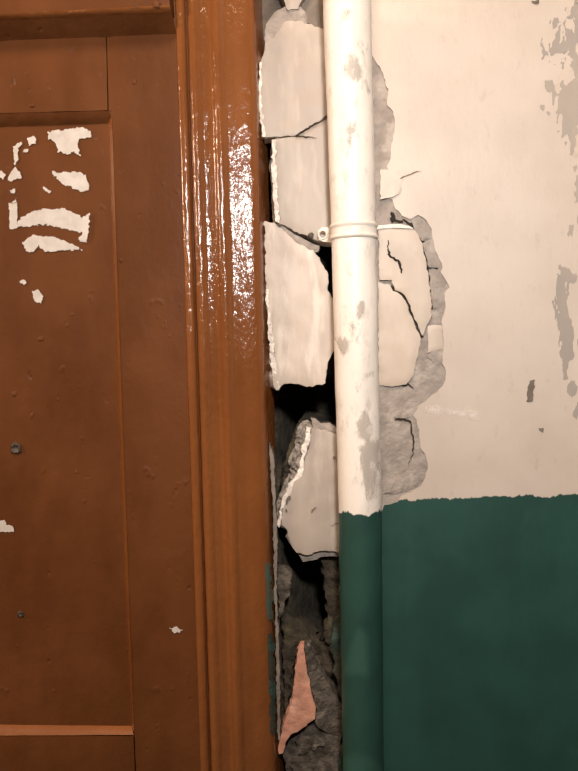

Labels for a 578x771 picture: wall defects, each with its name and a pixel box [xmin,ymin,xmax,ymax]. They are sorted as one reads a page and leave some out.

flaking render [259,0,324,70]
crack [295,115,327,138]
peeling [540,0,578,203]
flaking render [260,123,333,298]
flaking render [372,57,450,509]
crack [387,212,438,338]
peeling [552,265,578,419]
crack [395,418,415,465]
flaking render [267,332,343,771]